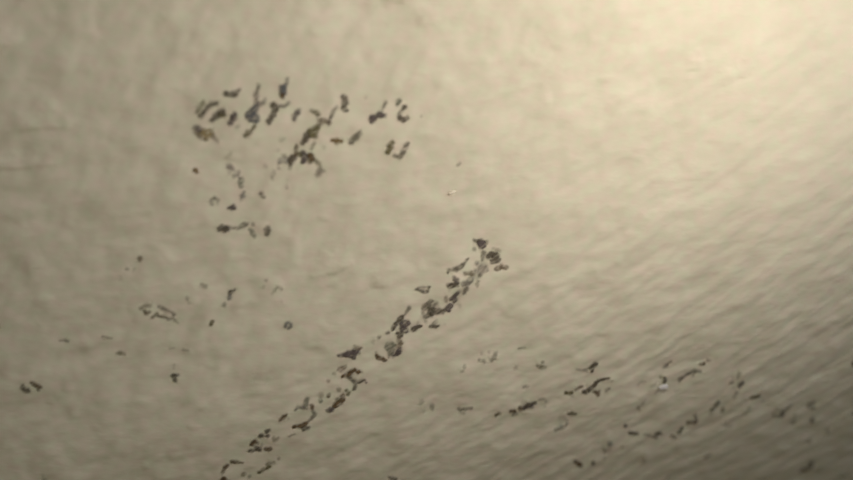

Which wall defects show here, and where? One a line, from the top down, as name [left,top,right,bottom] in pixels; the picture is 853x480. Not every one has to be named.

leakage [266,102,287,125]
leakage [338,350,365,383]